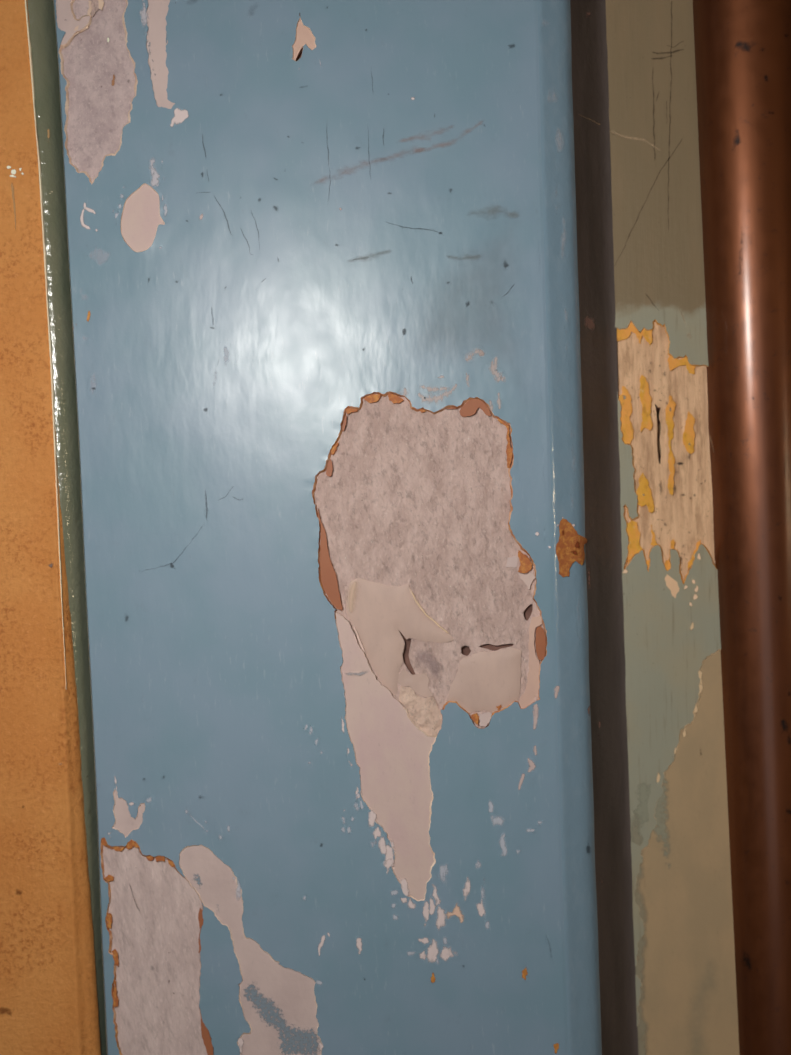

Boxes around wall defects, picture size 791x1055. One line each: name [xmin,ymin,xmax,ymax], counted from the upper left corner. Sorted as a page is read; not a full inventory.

peeling [56,0,138,184]
peeling [115,160,167,252]
peeling [140,0,188,127]
peeling [292,15,321,65]
peeling [617,320,717,606]
peeling [312,391,547,983]
peeling [100,778,323,1055]
peeling [632,649,740,1055]